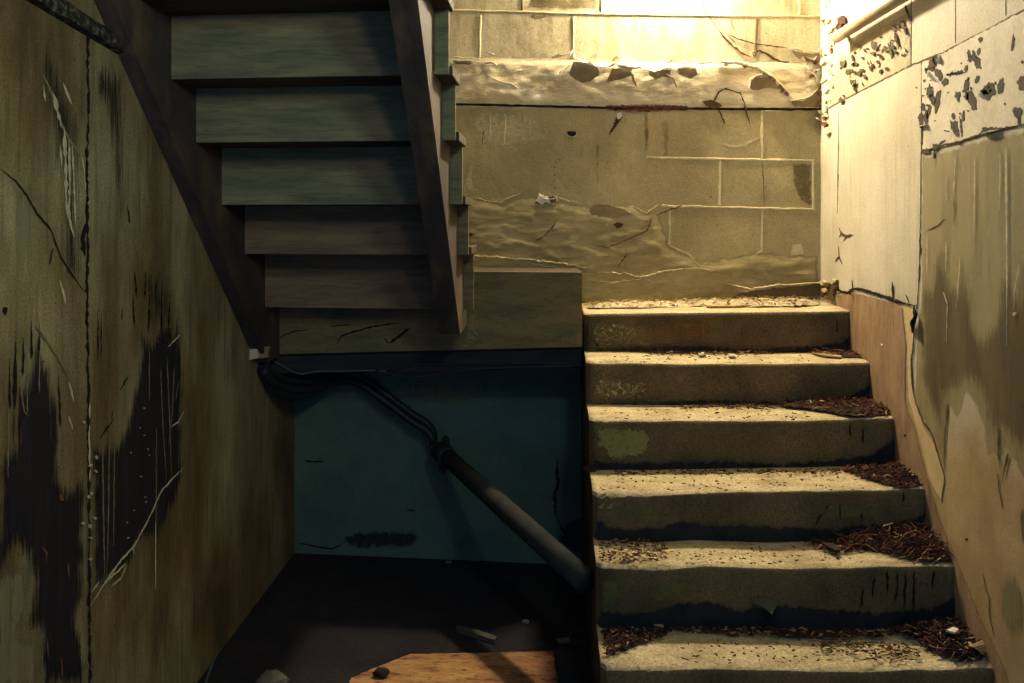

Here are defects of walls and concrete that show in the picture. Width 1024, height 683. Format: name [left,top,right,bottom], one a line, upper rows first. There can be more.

crack [1,36,98,683]
crack [331,323,409,343]
crack [456,103,609,144]
peeling [551,0,1024,159]
crack [664,88,944,309]
leakage [916,133,1024,483]
leakage [0,272,182,683]